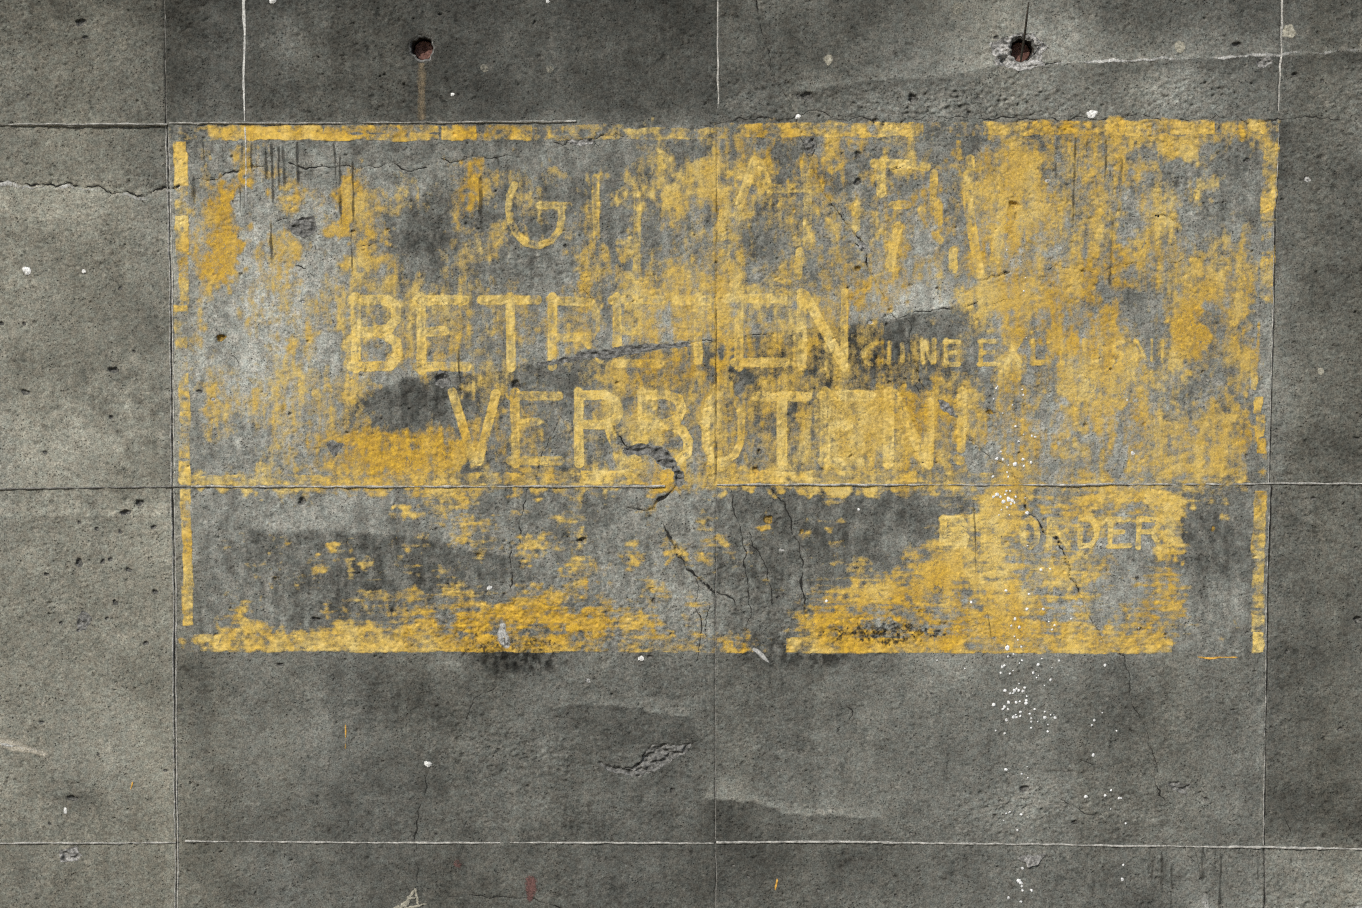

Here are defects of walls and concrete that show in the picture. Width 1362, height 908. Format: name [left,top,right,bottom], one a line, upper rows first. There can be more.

spalling [802,137,817,153]
crack [0,154,511,203]
spalling [288,215,317,238]
spalling [537,342,689,366]
spalling [434,370,464,395]
spalling [939,400,954,415]
spalling [327,442,344,456]
crack [702,0,1340,875]
spalling [624,444,684,487]
crack [628,472,807,661]
spalling [599,744,691,777]